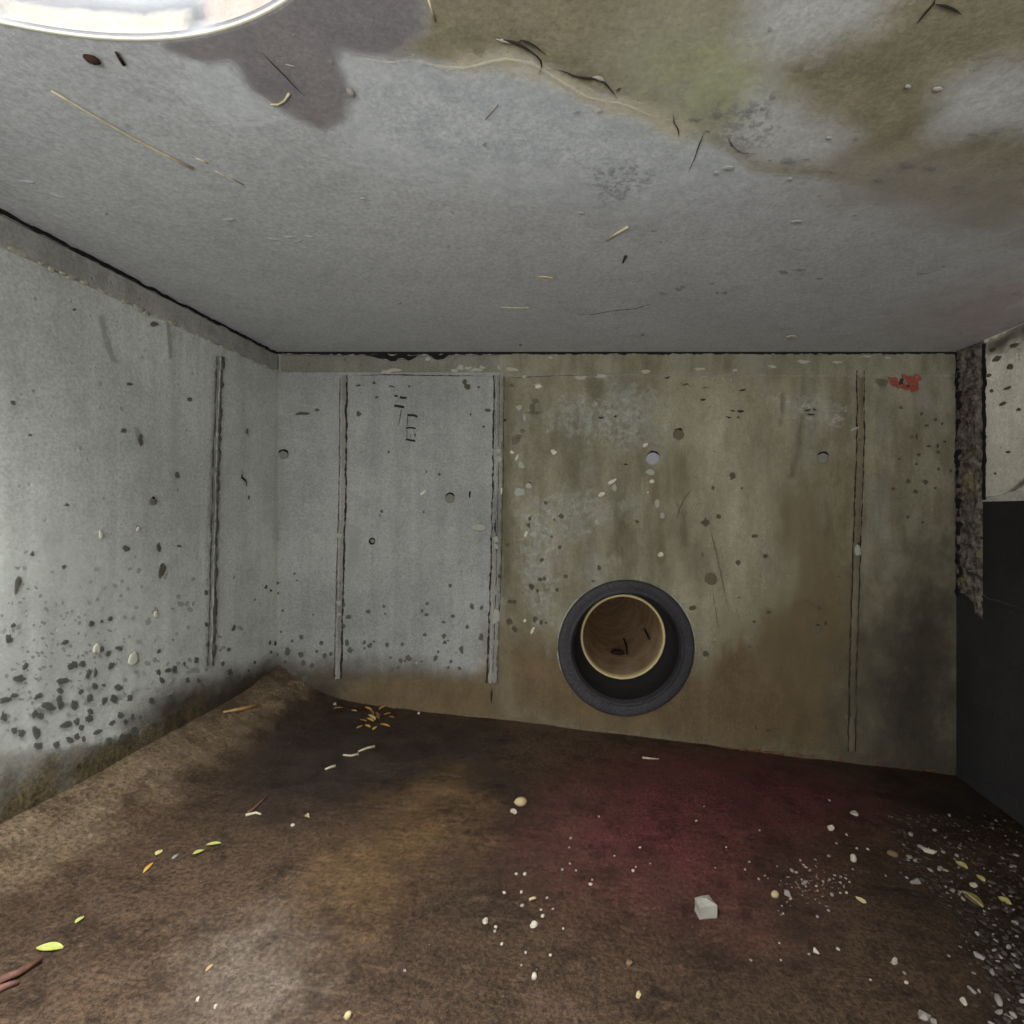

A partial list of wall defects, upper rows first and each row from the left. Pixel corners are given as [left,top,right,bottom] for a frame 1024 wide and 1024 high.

water stain [24,0,728,189]
water stain [521,494,601,625]
water stain [549,375,843,651]
water stain [0,551,483,882]
water stain [848,578,1024,845]